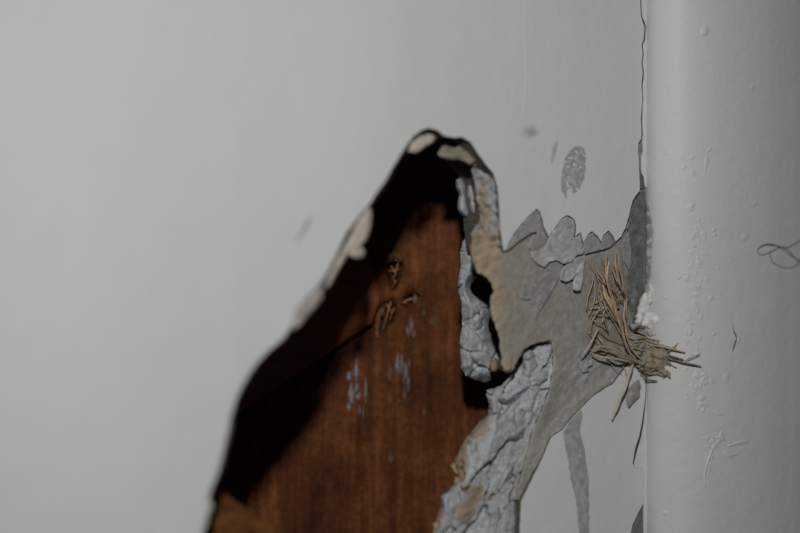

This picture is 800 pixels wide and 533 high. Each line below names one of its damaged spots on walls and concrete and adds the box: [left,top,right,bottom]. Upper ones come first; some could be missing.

crack [637,0,645,189]
spalling [203,132,436,533]
peeling [433,144,659,533]